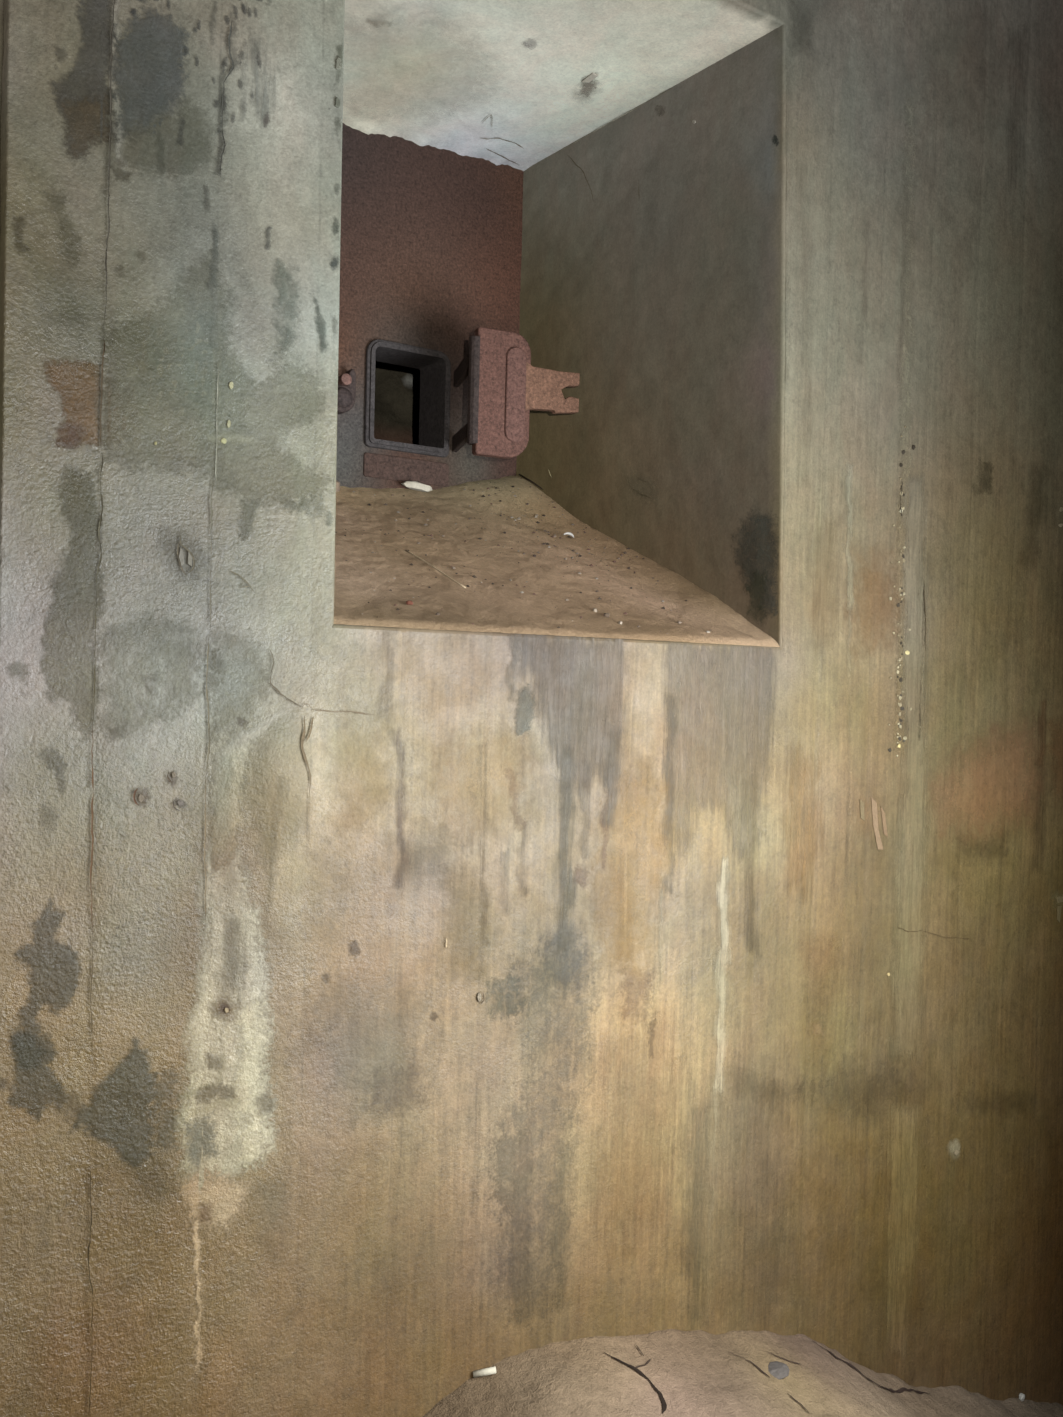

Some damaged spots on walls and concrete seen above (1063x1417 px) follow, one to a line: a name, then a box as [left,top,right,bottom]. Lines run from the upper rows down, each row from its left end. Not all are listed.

leakage [52,0,212,180]
leakage [733,510,779,616]
leakage [486,634,624,1322]
leakage [664,643,772,1115]